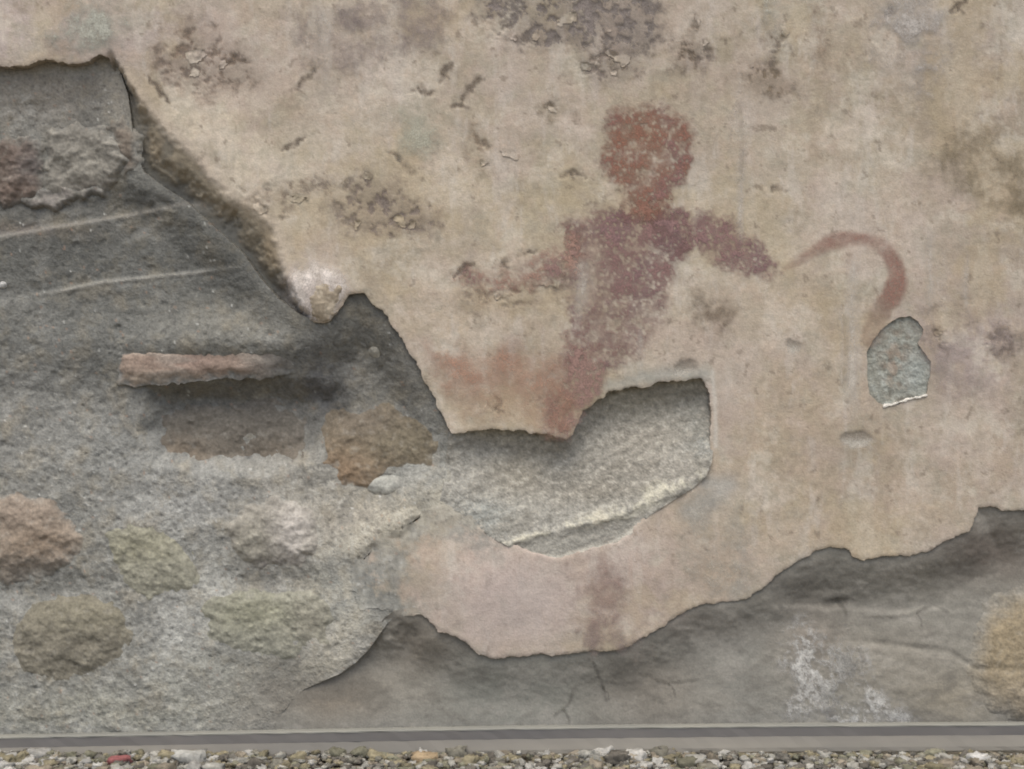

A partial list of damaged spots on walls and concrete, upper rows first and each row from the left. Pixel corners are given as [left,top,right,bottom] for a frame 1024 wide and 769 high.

peeling [156,29,240,83]
spalling [0,57,713,734]
spalling [867,316,943,408]
spalling [269,506,1024,730]
leakage [784,623,910,723]